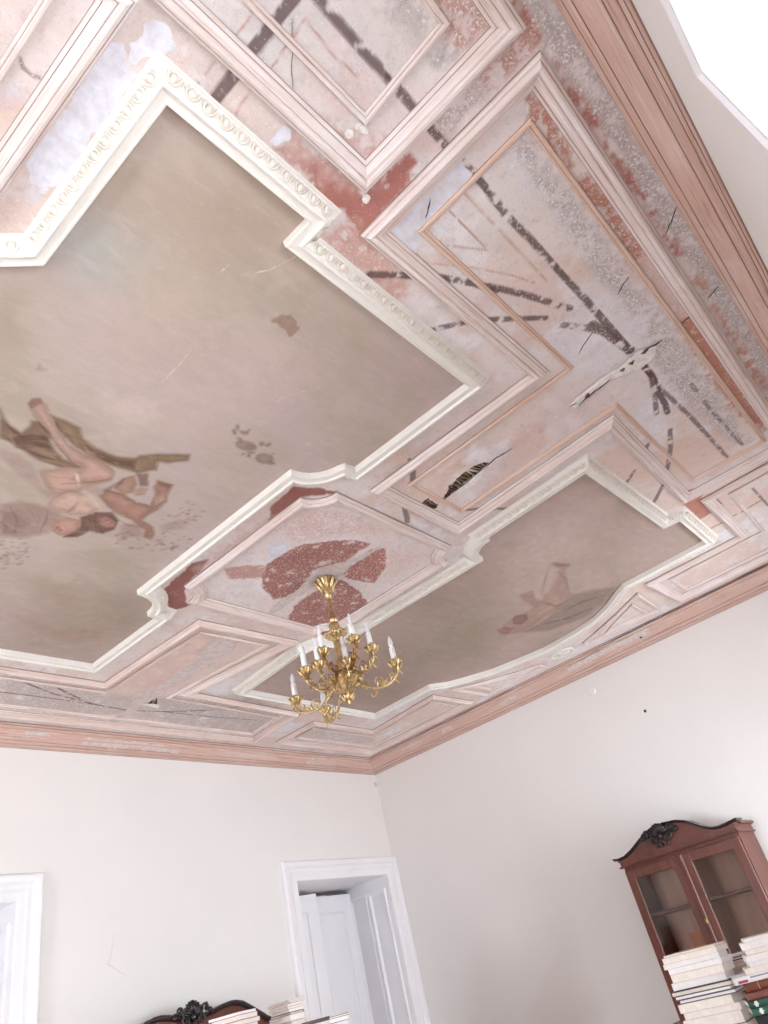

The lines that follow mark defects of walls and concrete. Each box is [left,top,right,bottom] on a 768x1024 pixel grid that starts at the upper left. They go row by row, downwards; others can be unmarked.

flaking render [24,18,182,197]
damp [270,313,300,338]
flaking render [266,542,288,563]